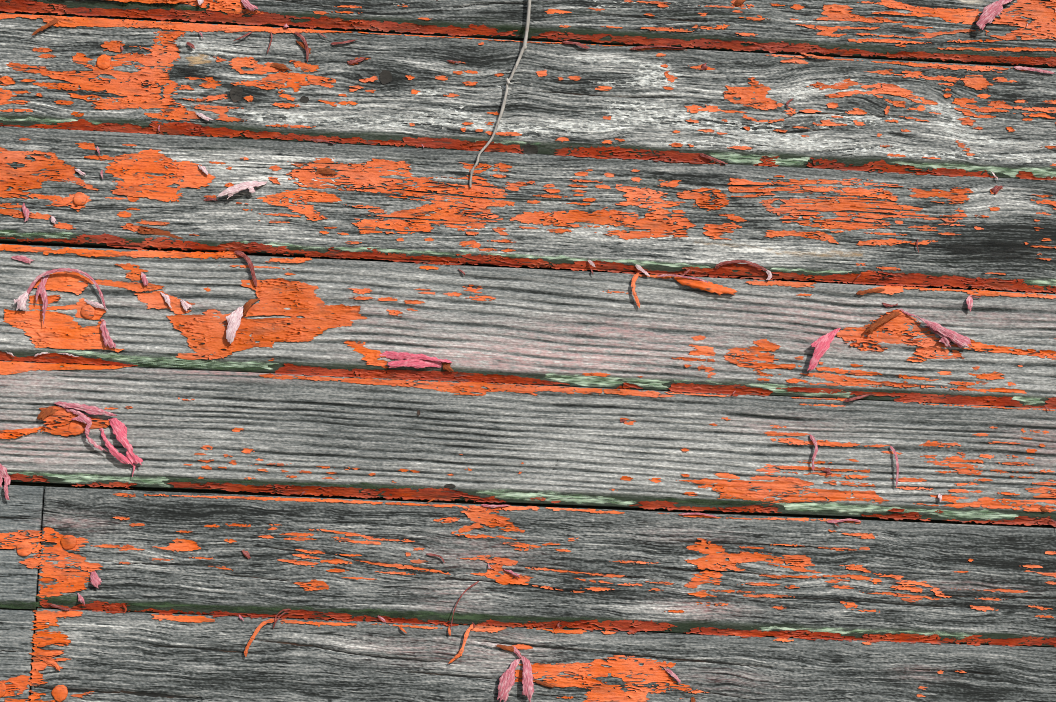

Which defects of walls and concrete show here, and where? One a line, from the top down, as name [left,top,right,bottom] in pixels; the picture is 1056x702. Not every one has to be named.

peeling [0,0,1056,411]
peeling [0,401,1056,702]